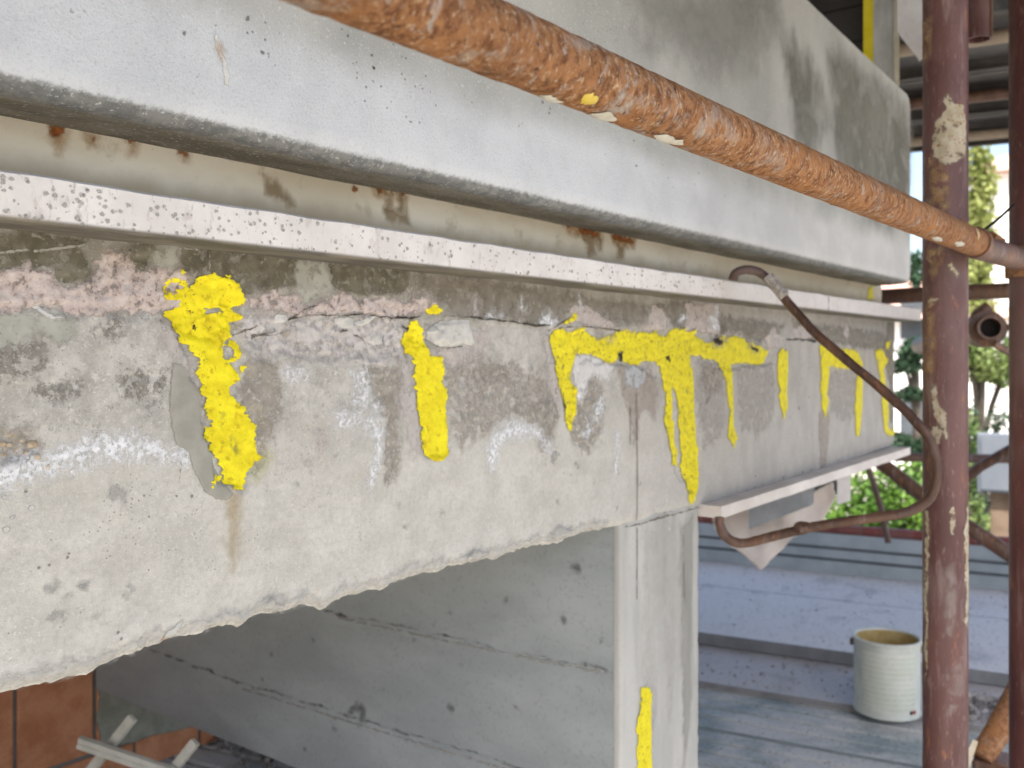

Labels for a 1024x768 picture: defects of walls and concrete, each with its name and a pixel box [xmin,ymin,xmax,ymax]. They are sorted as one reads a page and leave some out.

rust [50,126,64,144]
rust [567,226,635,258]
spalling [0,249,190,319]
crack [454,315,620,332]
efflorescence [0,433,189,490]
crack [625,393,699,593]
spalling [0,521,608,690]